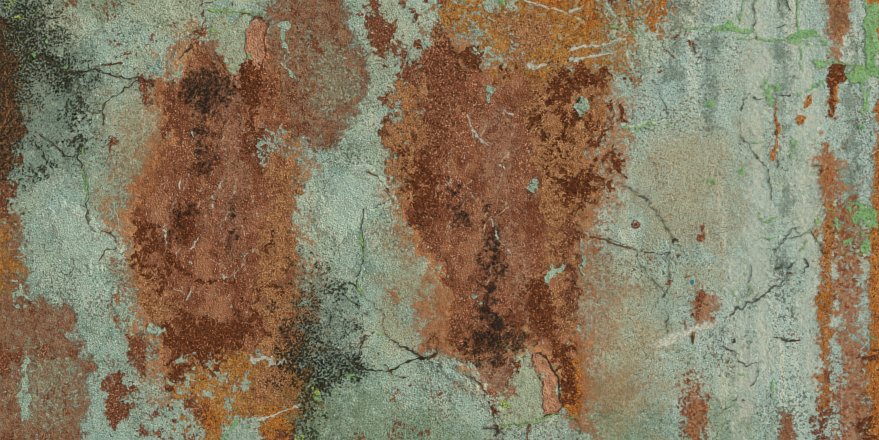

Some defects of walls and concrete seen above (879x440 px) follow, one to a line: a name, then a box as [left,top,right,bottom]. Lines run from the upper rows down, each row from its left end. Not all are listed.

corrosion [419,0,700,95]
corrosion [821,0,852,120]
corrosion [0,1,41,312]
crack [23,52,154,261]
corrosion [796,95,812,126]
crack [327,171,442,379]
corrosion [387,274,472,358]
corrosion [807,99,879,440]
corrosion [163,341,325,440]
crack [465,371,581,440]
corrosion [676,370,713,440]
corrosion [778,411,798,440]